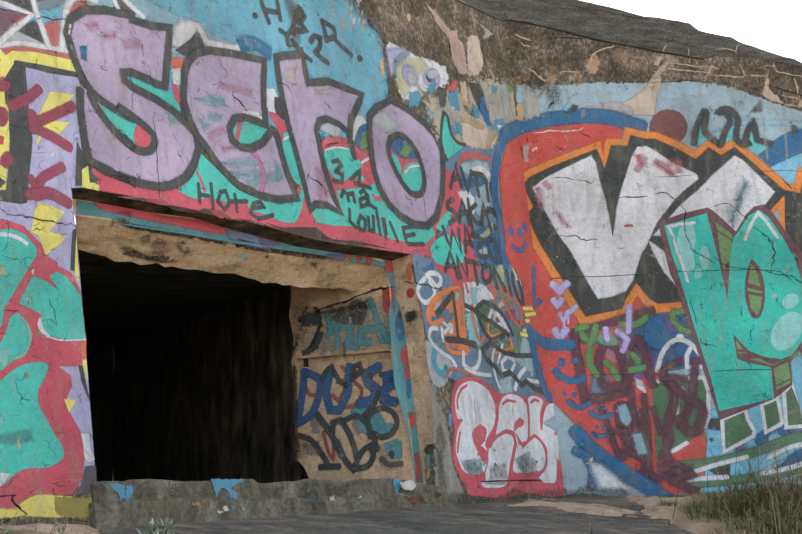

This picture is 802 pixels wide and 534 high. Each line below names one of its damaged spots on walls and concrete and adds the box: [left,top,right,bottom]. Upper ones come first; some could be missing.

peeling [425,2,559,150]
peeling [572,54,601,86]
crack [455,0,802,108]
peeling [522,144,537,163]
spalling [120,197,247,222]
spalling [267,223,393,250]
crack [620,174,802,283]
crack [719,363,771,383]